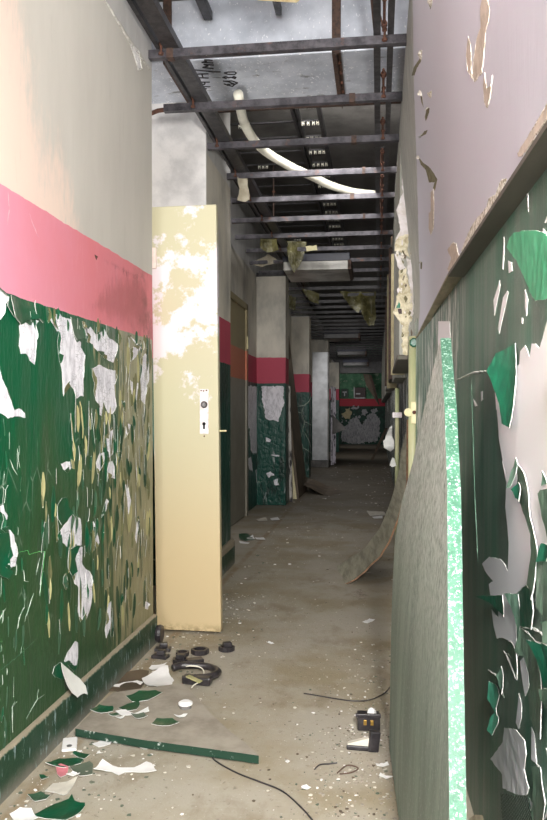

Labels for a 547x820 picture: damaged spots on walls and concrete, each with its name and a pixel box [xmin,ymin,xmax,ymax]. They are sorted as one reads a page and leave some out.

peeling [466,0,493,108]
peeling [517,104,547,157]
peeling [438,321,450,347]
peeling [447,178,507,272]
peeling [493,280,509,334]
peeling [502,217,547,323]
peeling [248,385,285,485]
peeling [341,405,380,444]
peeling [0,288,152,698]
crack [0,550,45,629]
peeling [475,322,547,820]
crack [12,689,42,730]